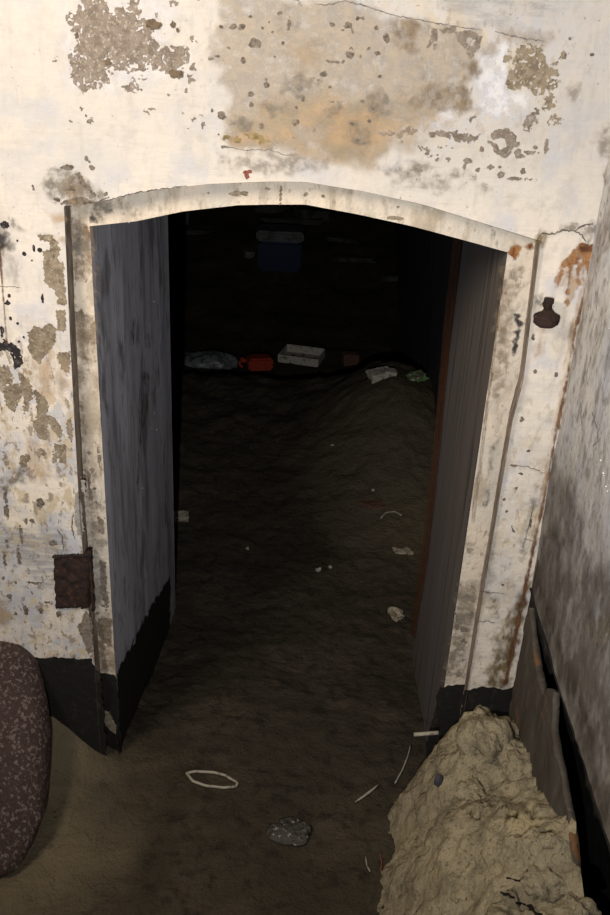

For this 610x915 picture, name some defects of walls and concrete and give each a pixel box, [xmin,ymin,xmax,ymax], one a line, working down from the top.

peeling [52,0,197,95]
flaking render [248,11,291,48]
flaking render [316,25,390,88]
peeling [426,26,482,58]
flaking render [182,108,226,129]
flaking render [218,123,270,148]
peeling [417,40,569,181]
flaking render [53,156,108,205]
rust [555,243,592,350]
peeling [0,234,73,469]
flaking render [1,518,42,585]
rust [503,366,570,685]